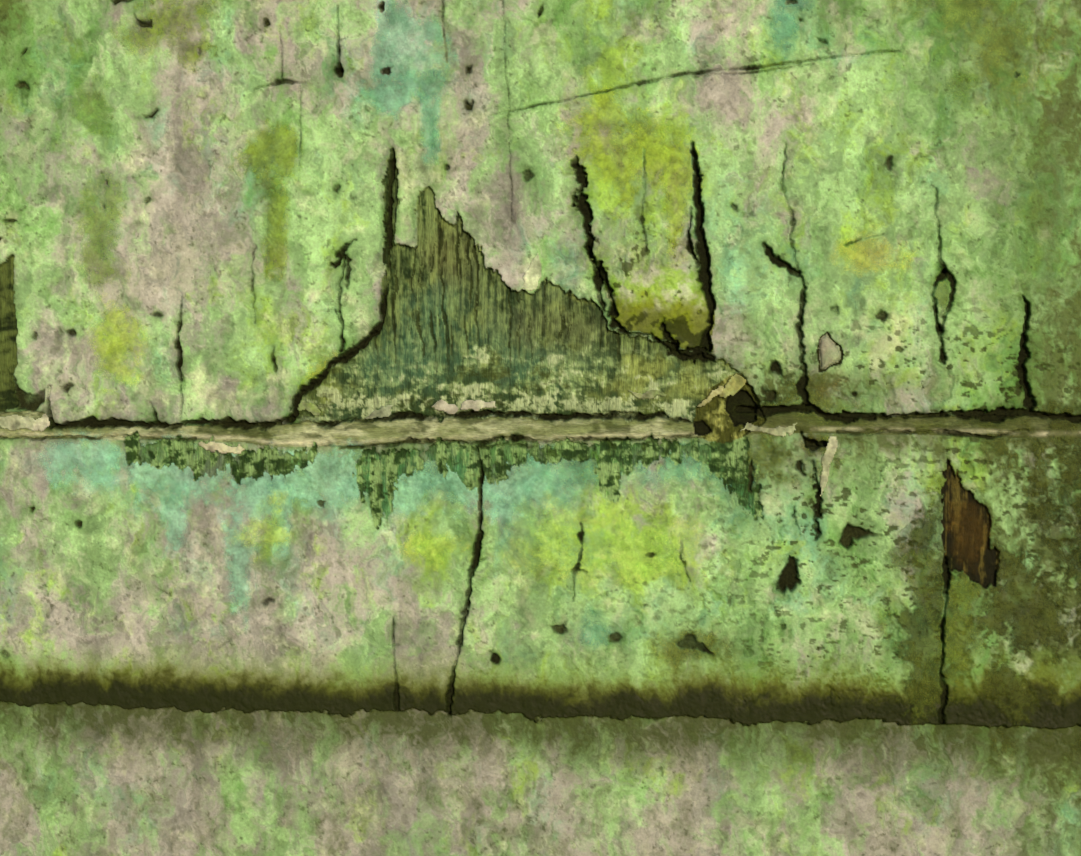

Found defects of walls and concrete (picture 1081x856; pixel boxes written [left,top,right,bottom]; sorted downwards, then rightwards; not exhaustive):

crack [489,0,899,221]
peeling [0,255,50,432]
peeling [289,149,797,529]
crack [570,142,716,363]
crack [735,144,1081,541]
peeling [124,431,318,484]
crack [0,298,694,715]
peeling [806,436,838,496]
peeling [941,460,1001,588]
crack [938,556,951,724]